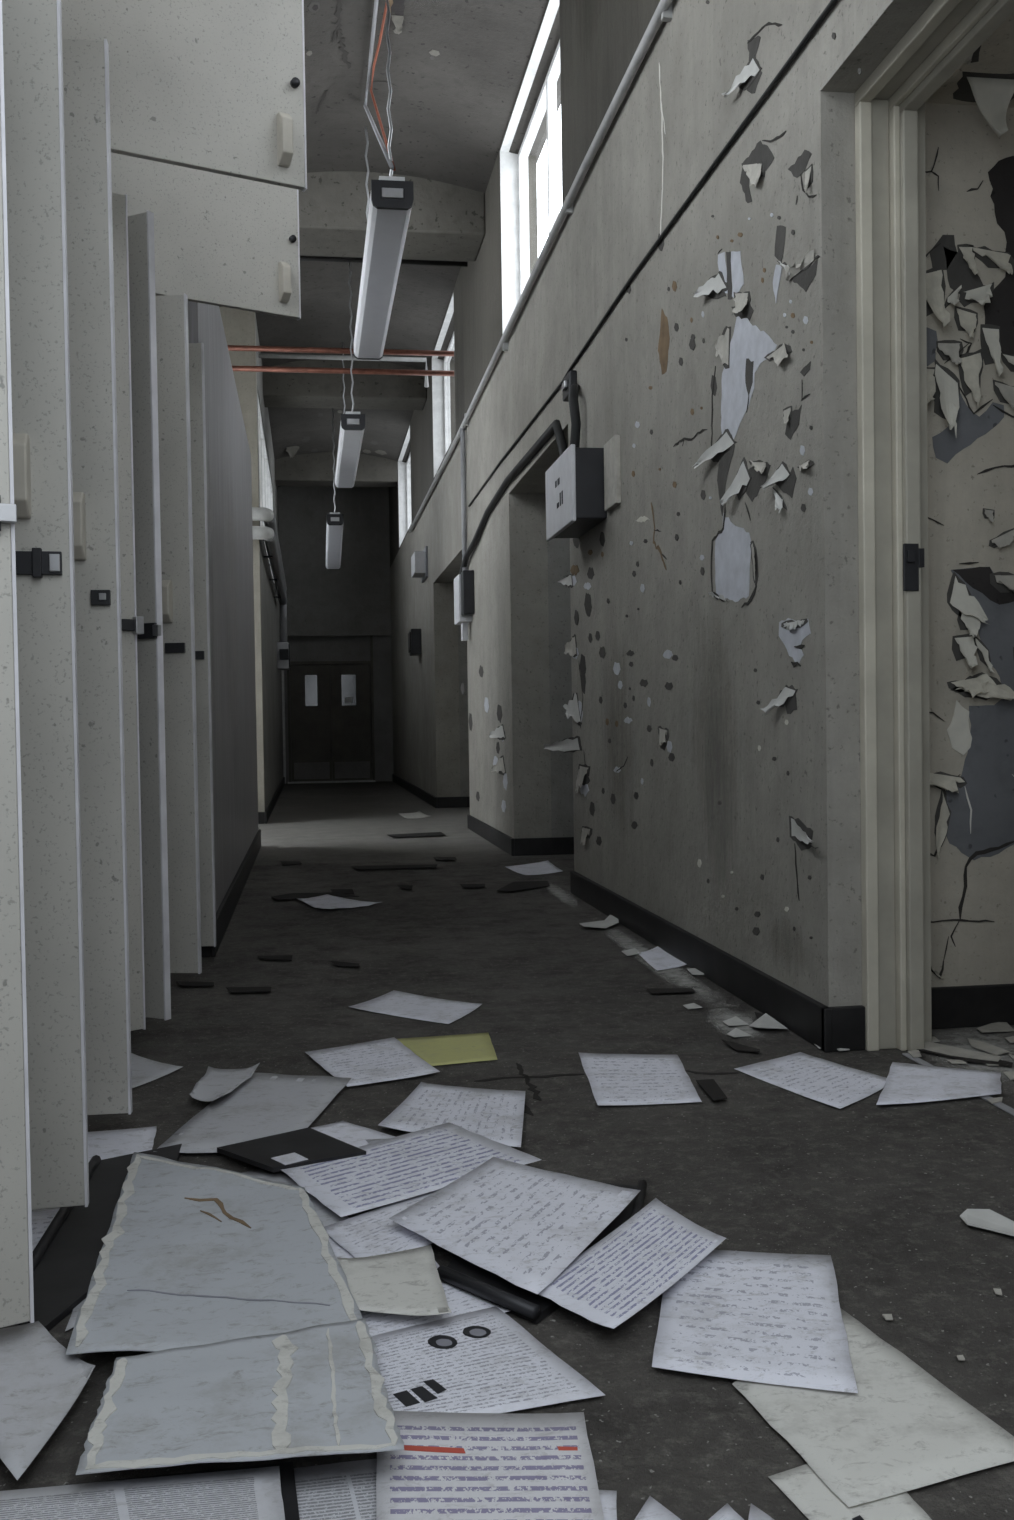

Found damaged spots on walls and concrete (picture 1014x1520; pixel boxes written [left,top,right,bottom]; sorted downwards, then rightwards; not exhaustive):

peeling [722,22,782,98]
peeling [649,131,820,608]
peeling [926,156,1014,463]
peeling [543,532,675,846]
peeling [756,685,798,725]
peeling [779,618,811,667]
peeling [929,567,1014,860]
crack [931,841,1014,979]